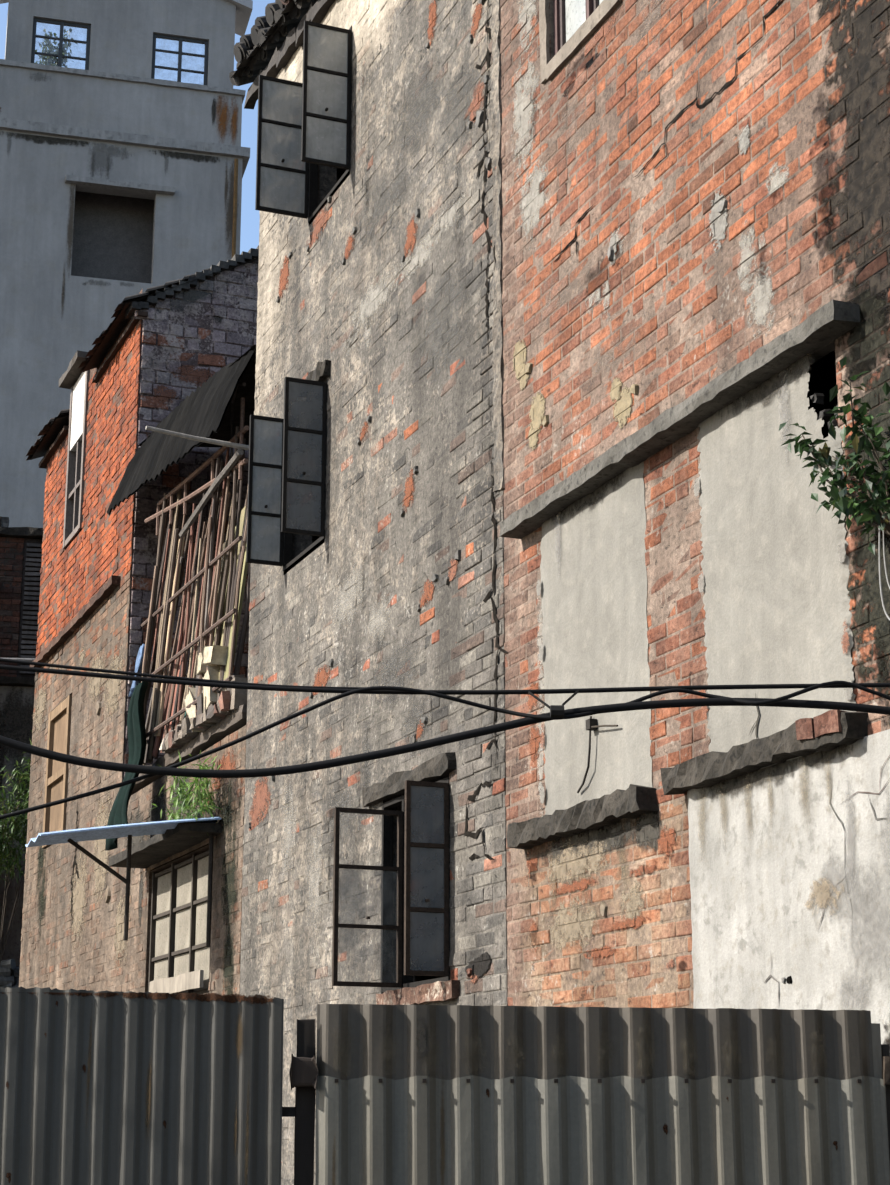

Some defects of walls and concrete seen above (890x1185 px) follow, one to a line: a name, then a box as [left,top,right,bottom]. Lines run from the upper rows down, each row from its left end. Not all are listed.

rust [212,96,238,140]
crack [475,2,496,362]
crack [633,0,781,178]
leakage [809,0,890,375]
spalling [810,393,839,429]
spalling [465,952,491,983]
leakage [702,744,849,800]
crack [817,755,890,931]
leakage [821,796,890,1009]